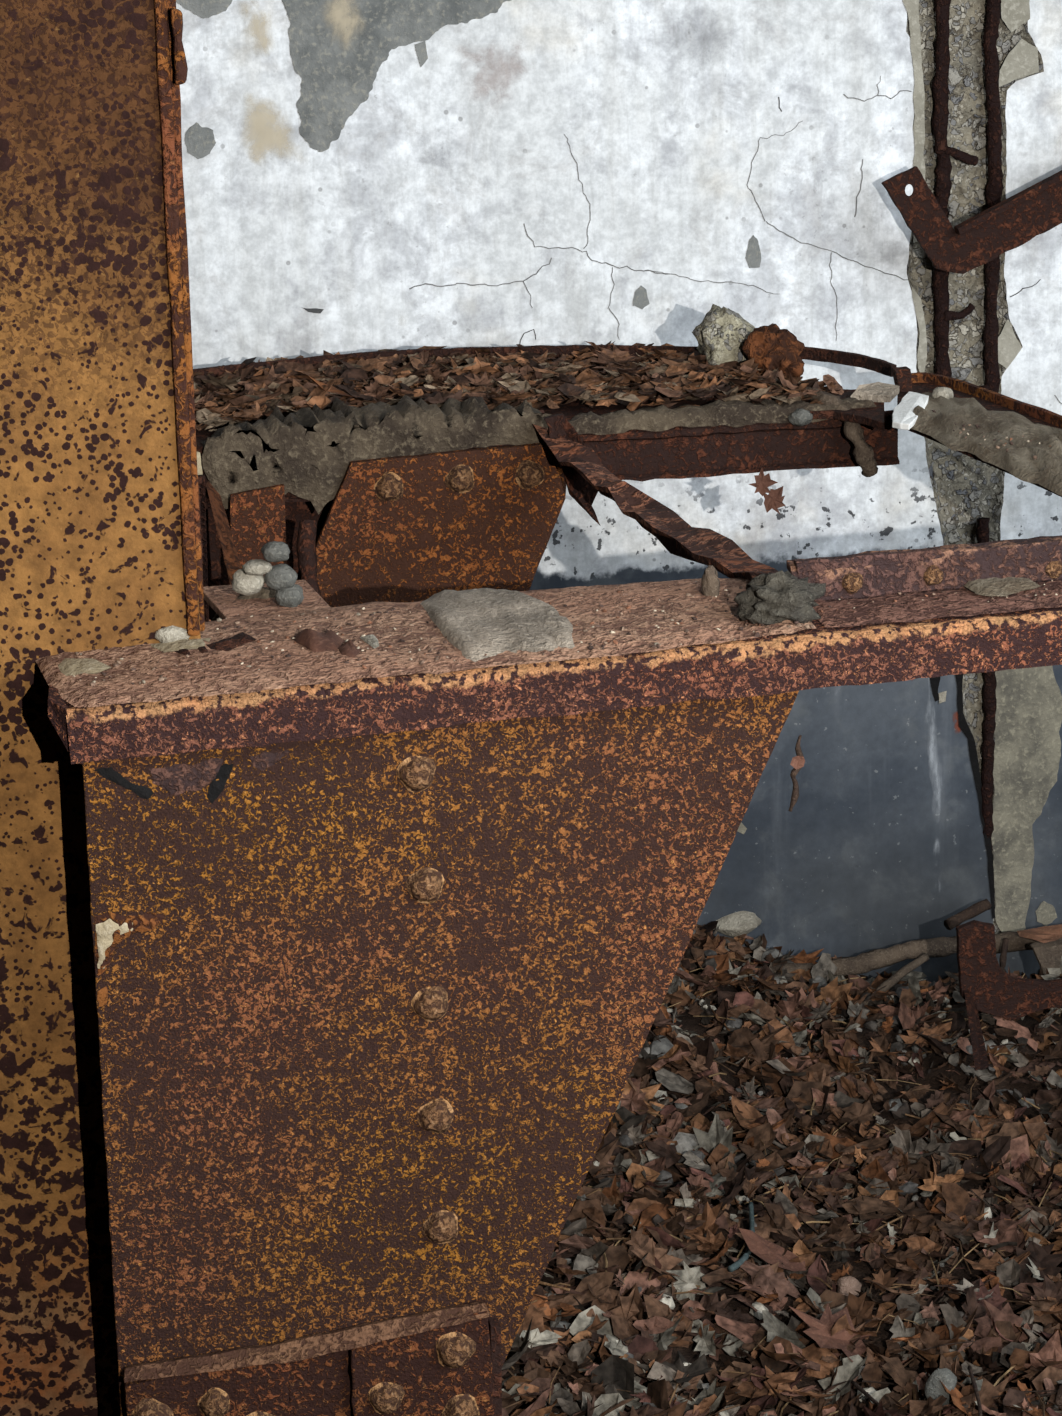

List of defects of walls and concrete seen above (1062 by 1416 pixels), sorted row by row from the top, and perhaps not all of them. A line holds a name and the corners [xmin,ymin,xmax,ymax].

crack [843,76,912,102]
spalling [903,0,1044,230]
crack [409,134,774,344]
crack [747,97,908,341]
spalling [907,231,1023,394]
spalling [851,382,1005,545]
rust [58,658,111,676]
rust [151,632,256,656]
rust [291,628,379,657]
rust [963,577,1040,596]
peeling [930,666,1062,934]